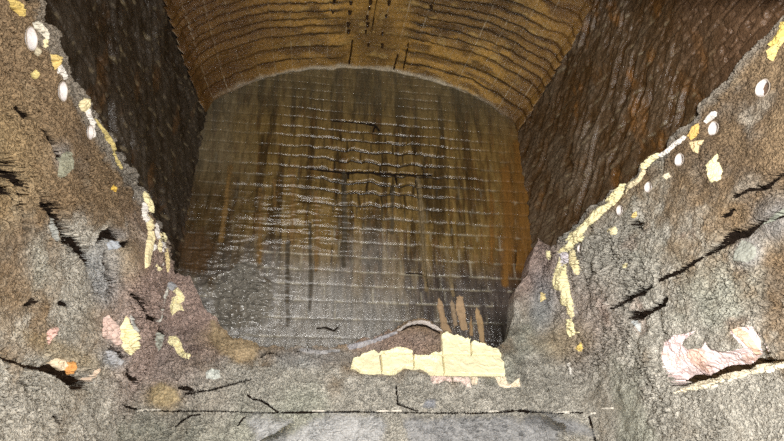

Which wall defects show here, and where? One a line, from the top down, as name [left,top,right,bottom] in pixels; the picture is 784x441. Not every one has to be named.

crack [393,43,409,70]
crack [13,107,59,160]
crack [0,161,164,334]
crack [610,170,784,321]
spalling [102,315,141,355]
crack [108,347,140,383]
flaking render [299,331,520,388]
spalling [661,327,784,386]
crack [122,378,596,441]